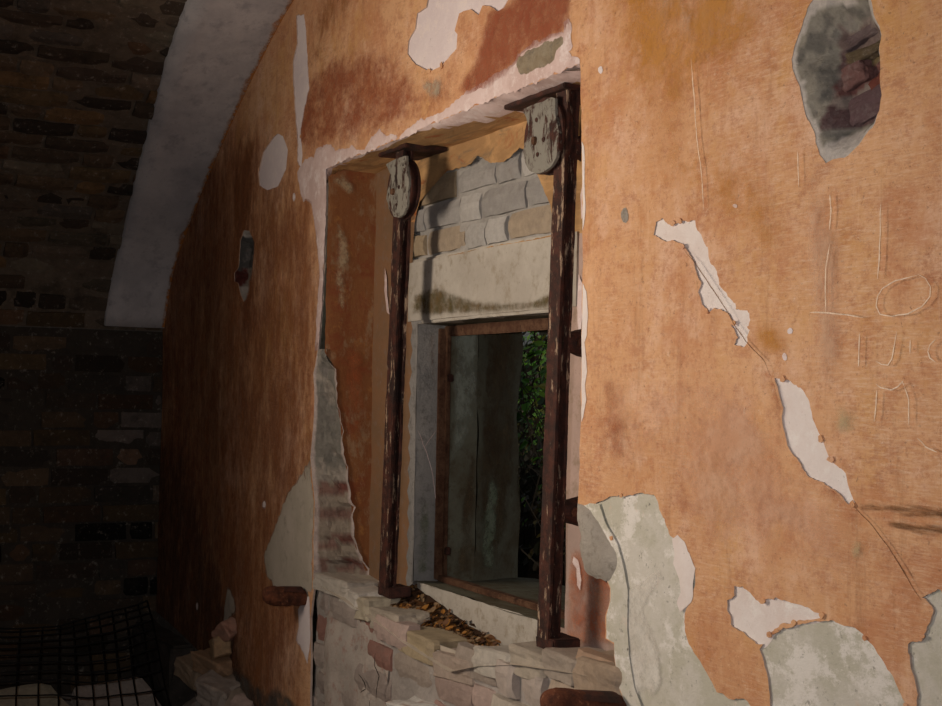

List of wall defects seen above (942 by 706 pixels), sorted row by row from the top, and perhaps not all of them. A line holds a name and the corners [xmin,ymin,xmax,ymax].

flaking render [409,0,508,74]
flaking render [792,0,882,163]
flaking render [235,230,254,301]
flaking render [258,15,750,706]
crack [683,248,769,372]
flaking render [776,375,855,508]
crack [857,510,920,598]
flaking render [729,587,942,706]